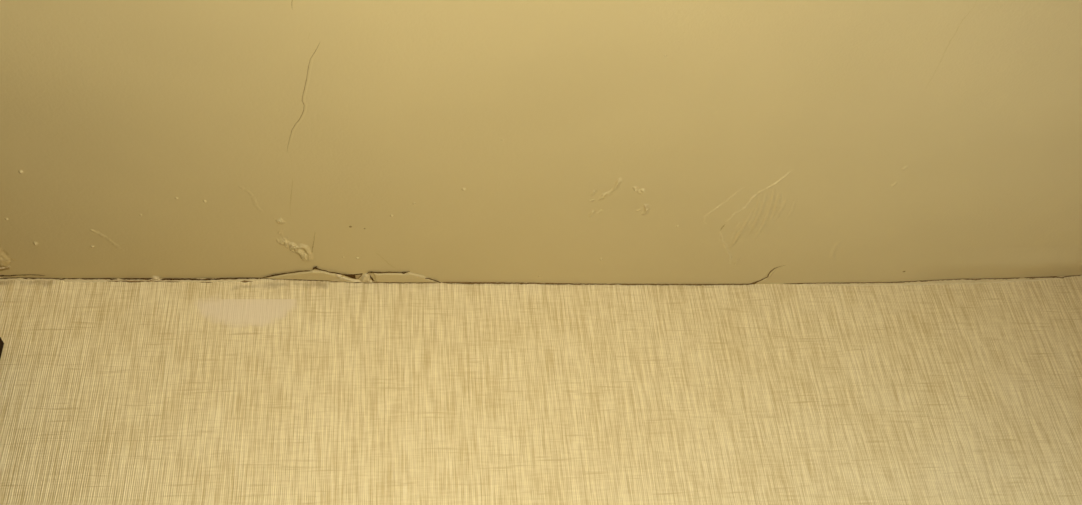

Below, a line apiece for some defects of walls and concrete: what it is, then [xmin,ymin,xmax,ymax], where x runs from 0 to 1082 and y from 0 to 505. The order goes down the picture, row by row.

crack [287,33,320,149]
crack [0,265,1081,286]